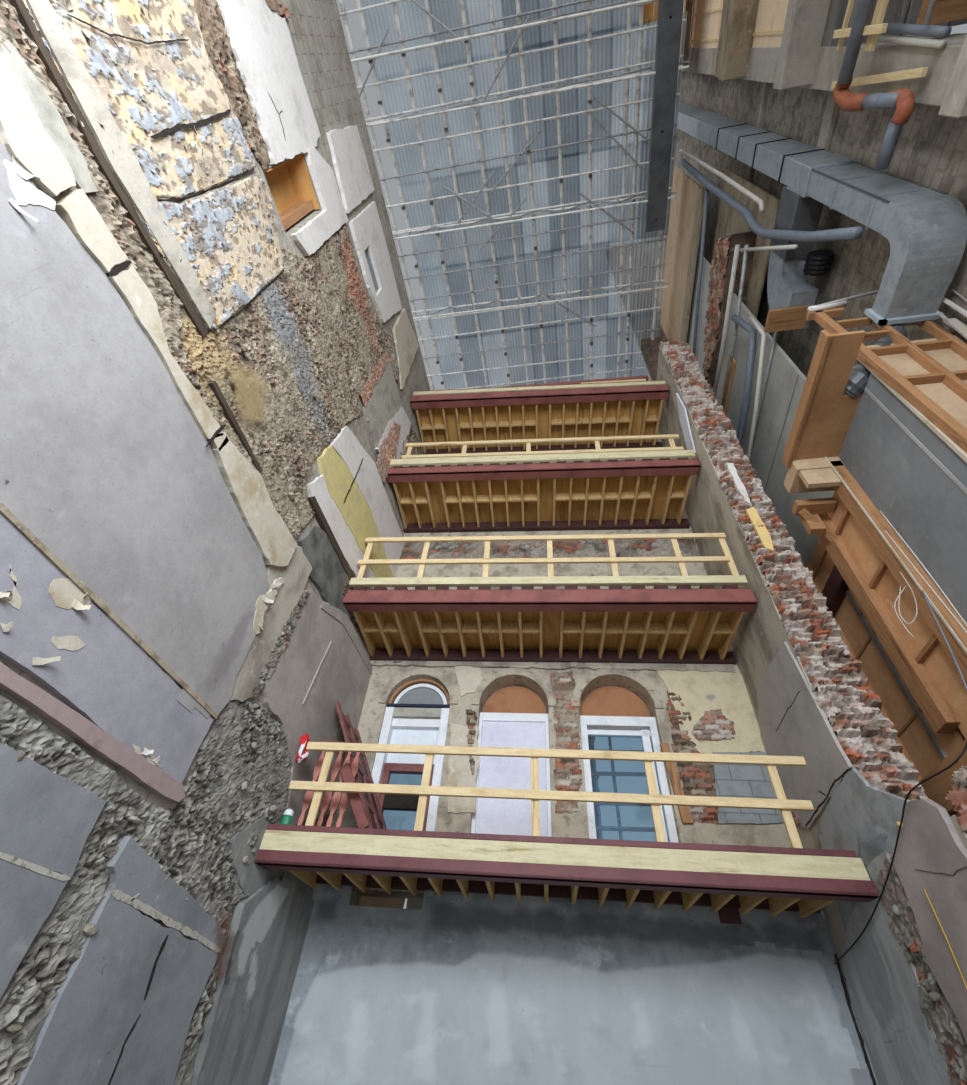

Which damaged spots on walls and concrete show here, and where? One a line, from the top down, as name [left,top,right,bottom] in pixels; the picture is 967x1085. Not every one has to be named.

spalling [0,0,400,542]
spalling [376,421,441,483]
spalling [659,231,929,801]
peeling [48,578,91,610]
peeling [253,577,284,635]
spalling [666,690,736,825]
crack [805,767,853,827]
spalling [945,766,967,831]
crack [0,852,71,881]
spalling [0,590,310,1085]
crack [915,866,967,876]
crack [108,890,221,1085]